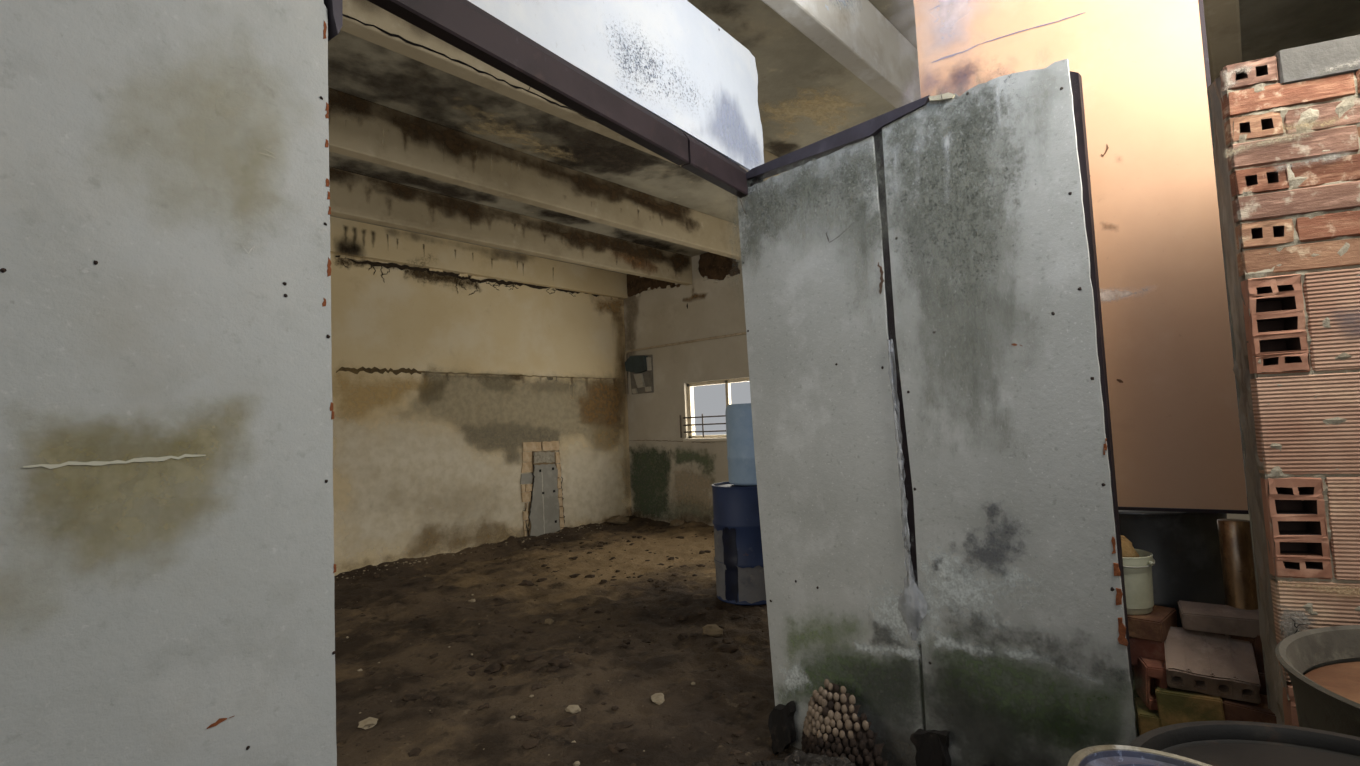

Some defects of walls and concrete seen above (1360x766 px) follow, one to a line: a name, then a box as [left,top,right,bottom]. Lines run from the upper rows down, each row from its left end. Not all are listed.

leakage [329,162,690,272]
leakage [328,60,695,229]
leakage [611,33,696,102]
leakage [734,89,1018,392]
leakage [23,426,220,542]
leakage [855,504,1123,679]